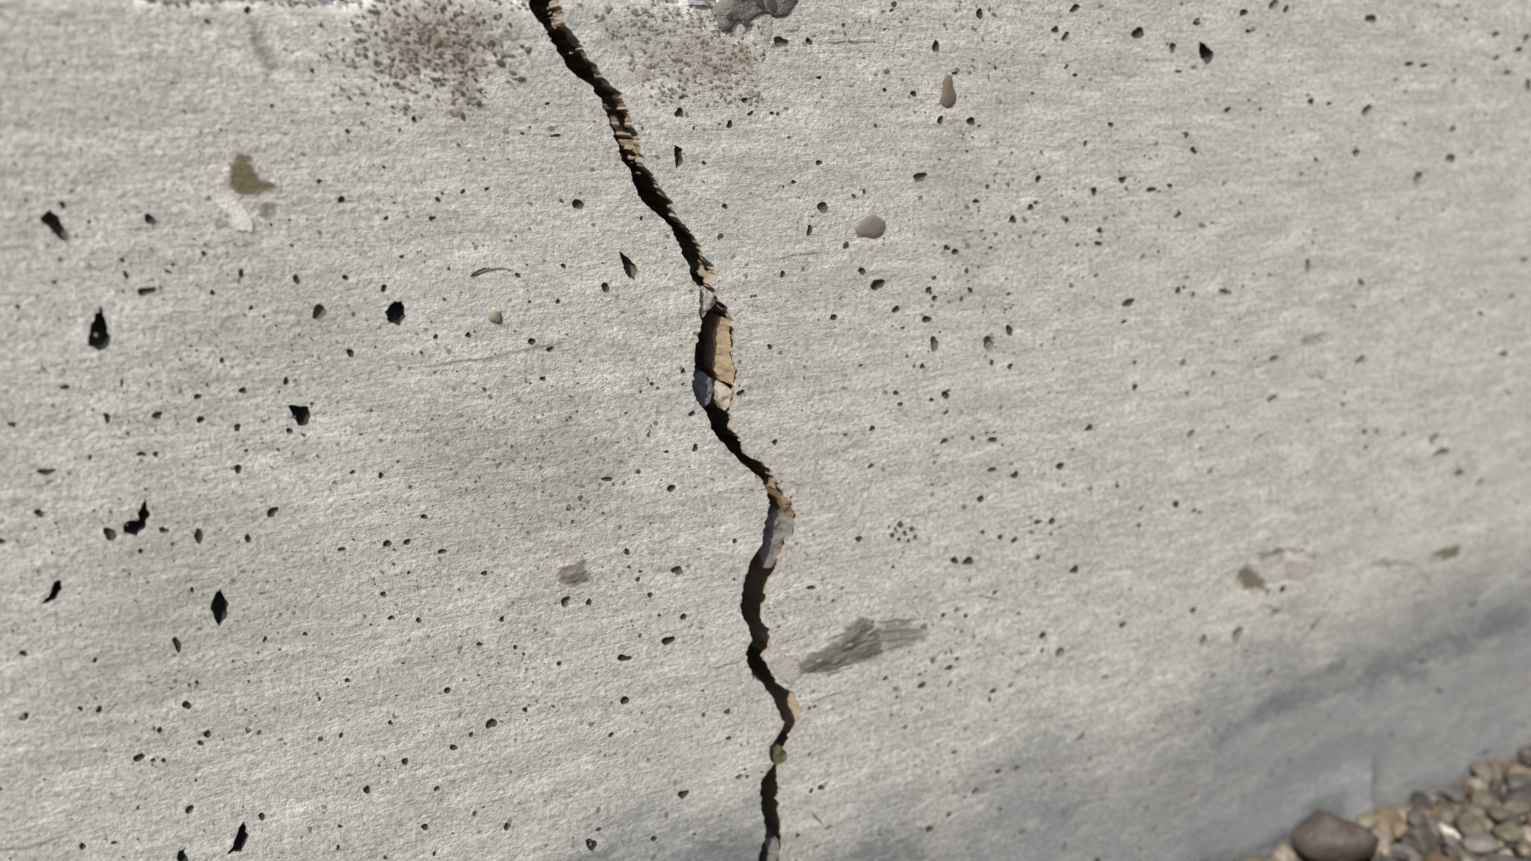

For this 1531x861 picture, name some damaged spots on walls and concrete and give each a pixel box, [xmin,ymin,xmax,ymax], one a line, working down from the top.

crack [528,0,841,861]